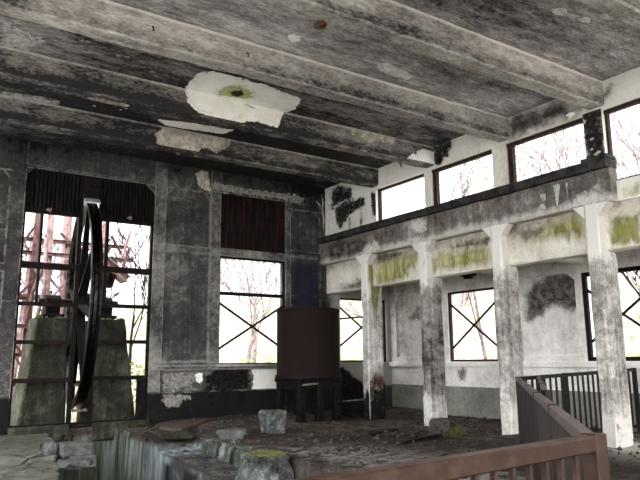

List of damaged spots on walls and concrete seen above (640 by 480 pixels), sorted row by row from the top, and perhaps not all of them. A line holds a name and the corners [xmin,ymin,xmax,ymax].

peeling [185,71,301,128]
peeling [154,119,233,157]
mould [433,141,451,165]
peeling [195,171,305,204]
mould [331,185,376,229]
peeling [162,372,203,408]